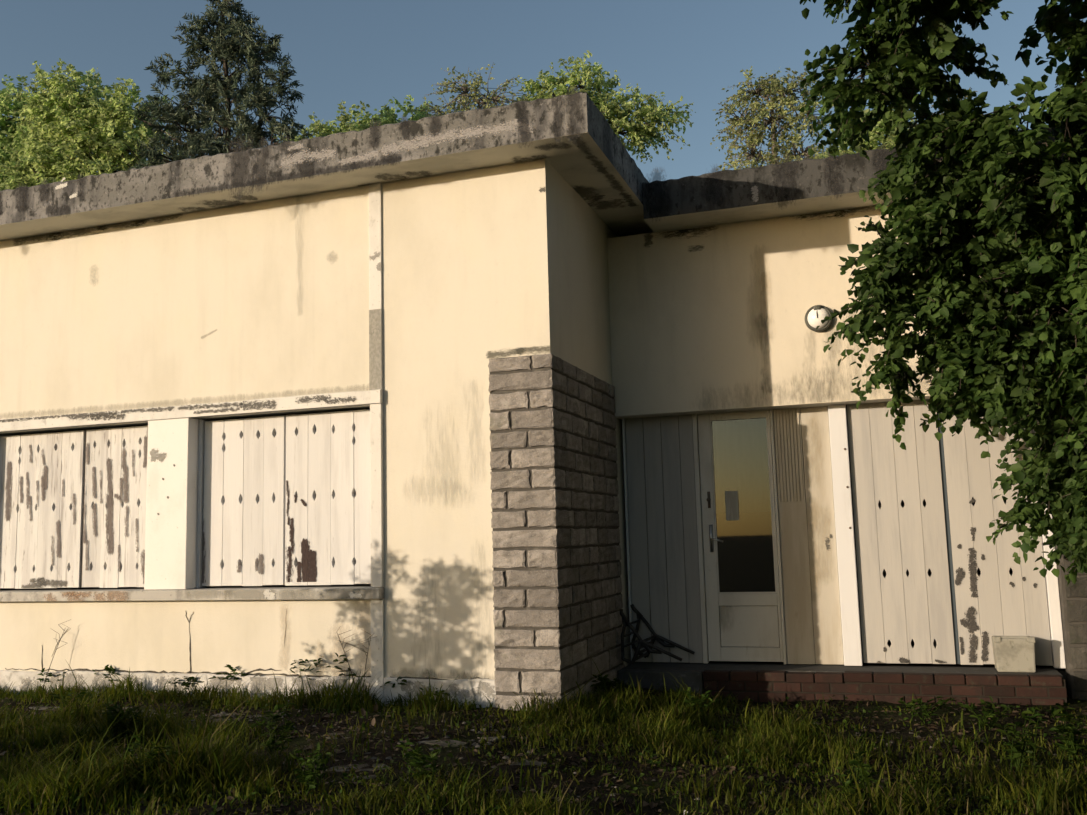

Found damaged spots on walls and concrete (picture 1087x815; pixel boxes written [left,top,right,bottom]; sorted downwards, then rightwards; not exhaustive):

leakage [14,87,665,245]
leakage [772,154,798,207]
leakage [801,153,889,218]
peeling [5,445,48,522]
peeling [51,519,61,566]
peeling [62,435,175,584]
peeling [955,527,990,663]